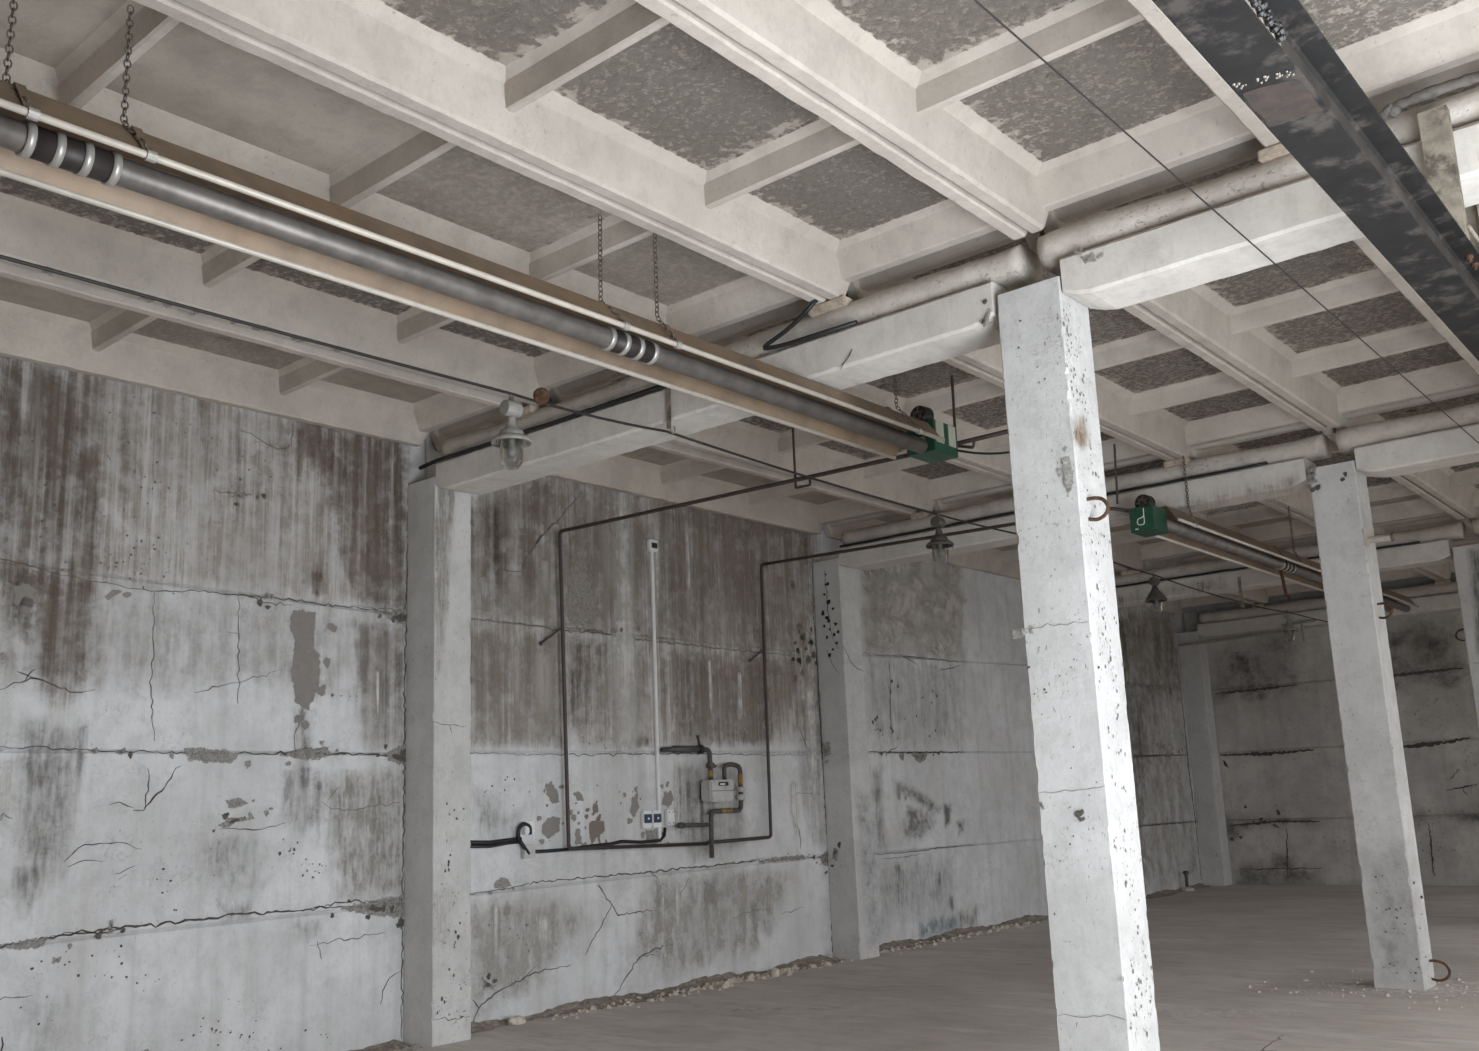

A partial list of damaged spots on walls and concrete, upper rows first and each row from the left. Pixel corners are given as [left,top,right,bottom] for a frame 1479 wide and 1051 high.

leakage [0,356,403,675]
peeling [281,610,357,766]
leakage [361,628,400,739]
leakage [471,479,839,826]
crack [1393,667,1463,677]
spalling [212,798,273,833]
leakage [301,776,401,890]
crack [0,483,972,1039]
peeling [529,782,607,846]
peeling [619,781,676,844]
leakage [1119,618,1194,874]
crack [1403,737,1477,796]